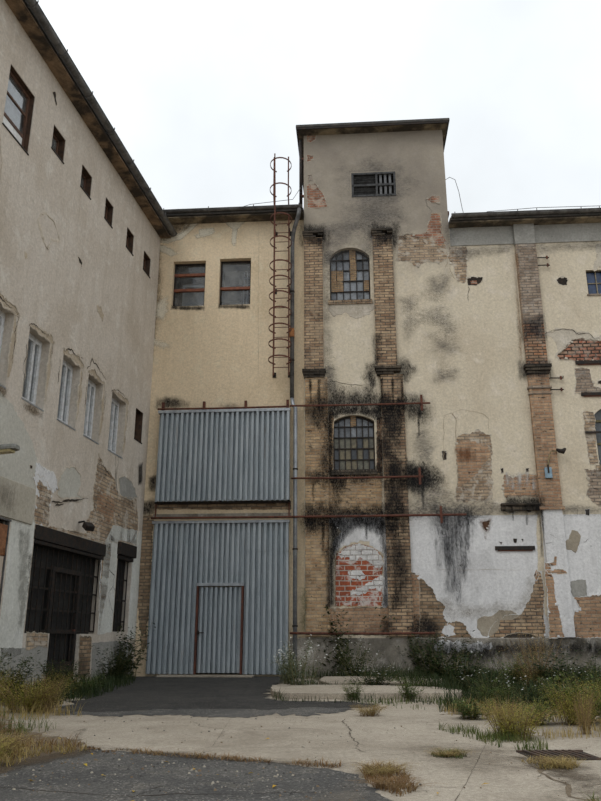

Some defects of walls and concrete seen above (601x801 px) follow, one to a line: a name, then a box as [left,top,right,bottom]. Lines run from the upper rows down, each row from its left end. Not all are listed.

spalling [396,196,483,286]
crack [0,296,129,431]
spalling [545,328,601,394]
spalling [441,429,539,503]
spalling [583,411,601,516]
spalling [30,452,292,680]
leakage [305,518,339,603]
leakage [384,481,407,609]
leakage [434,507,472,592]
peeling [406,511,601,654]
spalling [25,631,48,651]
crack [455,746,597,801]